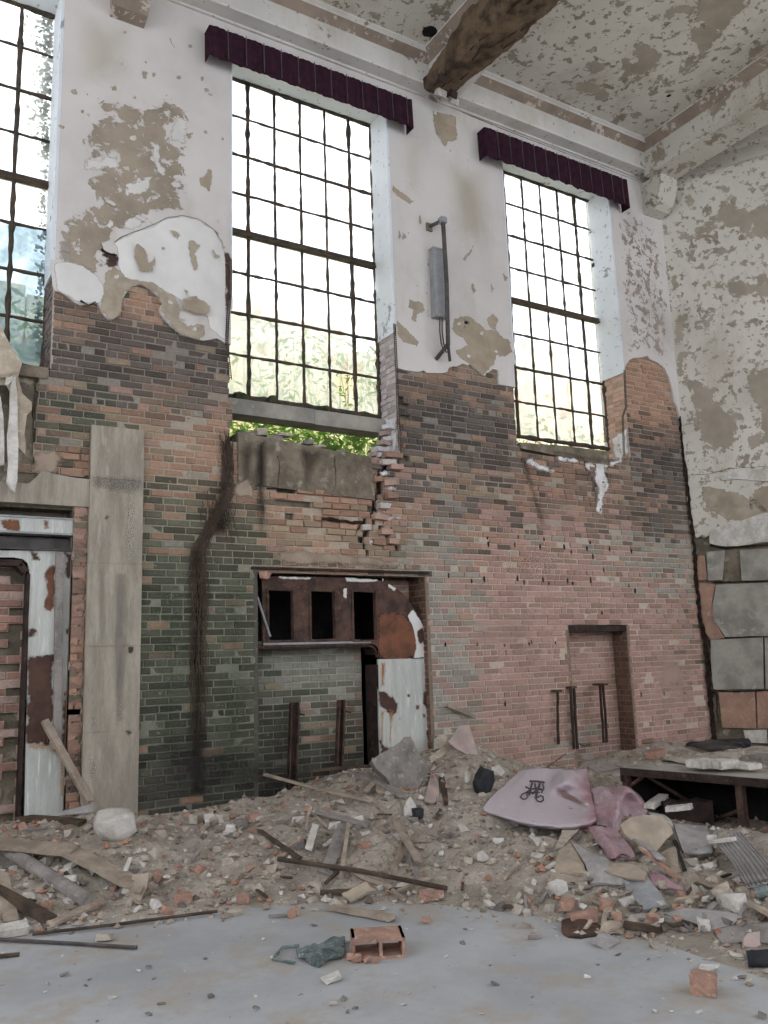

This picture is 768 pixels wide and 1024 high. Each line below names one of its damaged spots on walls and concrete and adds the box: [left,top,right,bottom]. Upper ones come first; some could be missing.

spalling [423,0,560,146]
peeling [625,41,667,86]
peeling [664,0,746,63]
flaking render [56,86,207,340]
flaking render [706,193,768,244]
flaking render [452,314,512,374]
flaking render [619,211,768,451]
crack [321,419,404,554]
damp [526,430,628,514]
flaking render [699,484,768,521]
corrosion [31,551,71,611]
corrosion [378,612,427,720]